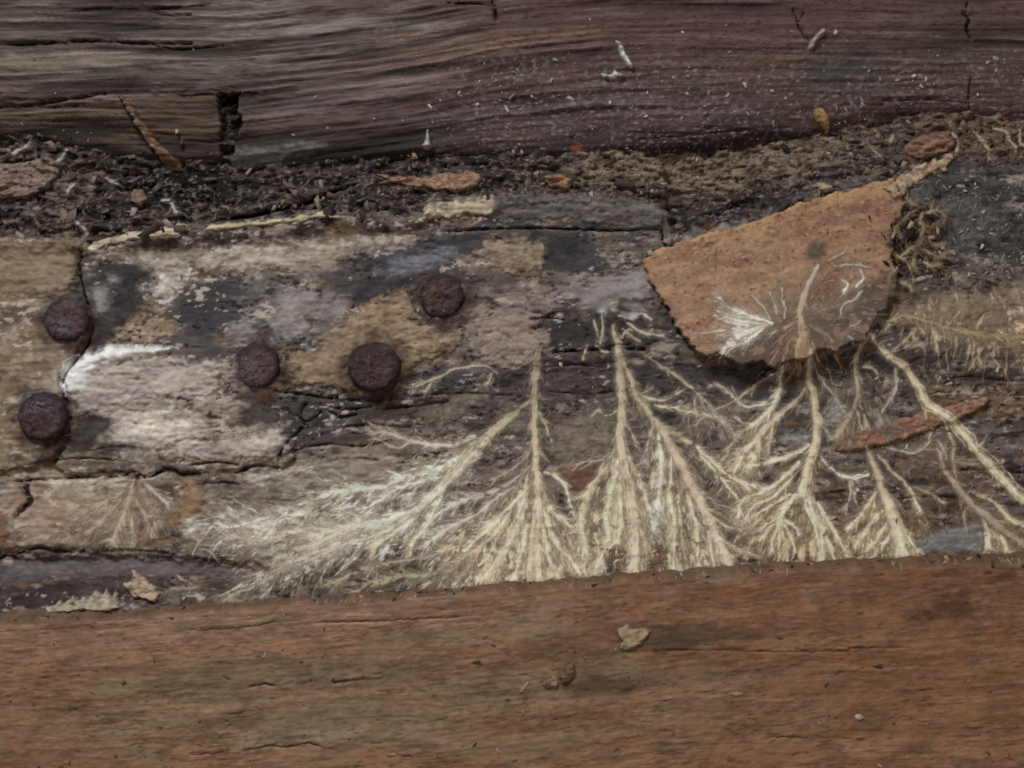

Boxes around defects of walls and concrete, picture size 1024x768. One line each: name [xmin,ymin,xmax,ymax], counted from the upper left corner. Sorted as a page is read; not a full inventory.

crack [176,91,260,153]
rust [41,306,98,359]
water stain [14,401,207,463]
water stain [244,429,282,453]
crack [17,392,512,516]
water stain [229,450,400,497]
water stain [562,466,593,489]
water stain [916,509,1011,552]
water stain [603,547,625,563]
water stain [649,545,668,569]